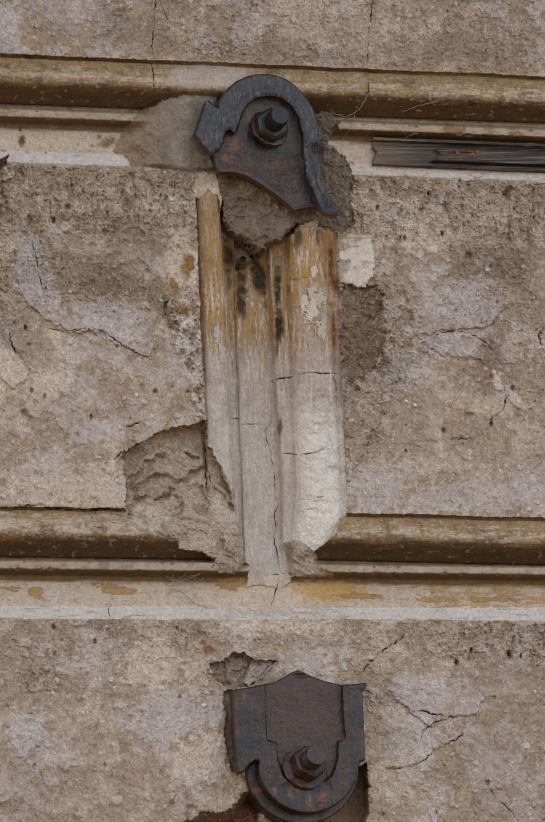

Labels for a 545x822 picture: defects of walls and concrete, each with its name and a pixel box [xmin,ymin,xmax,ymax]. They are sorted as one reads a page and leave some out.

flaking render [315,112,387,390]
crack [272,372,338,391]
flaking render [121,420,248,590]
crack [231,418,323,605]
peeling [0,586,44,600]
peeling [91,581,137,594]
flaking render [209,652,278,689]
crack [391,710,463,769]
flaking render [185,792,272,822]
flaking render [323,763,371,822]